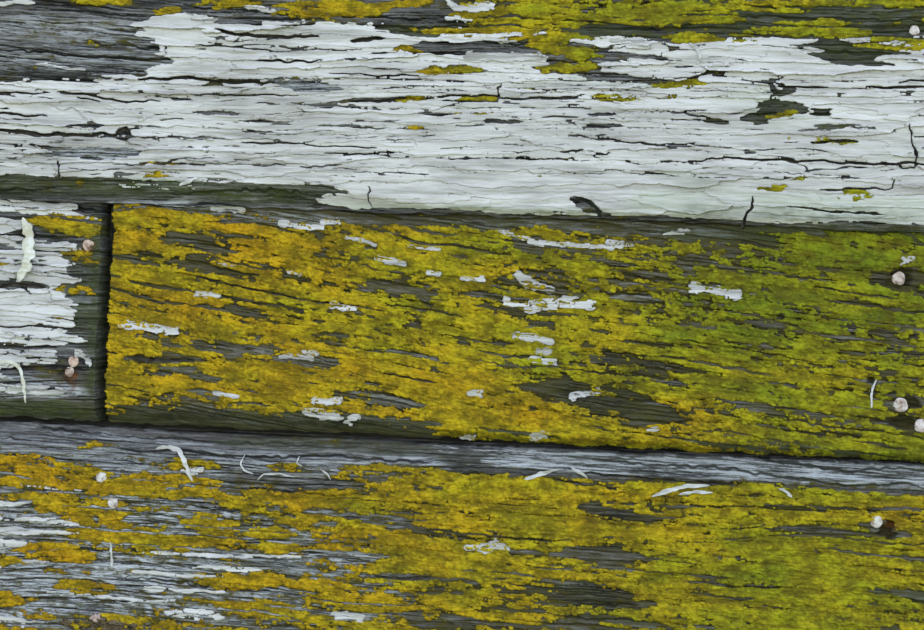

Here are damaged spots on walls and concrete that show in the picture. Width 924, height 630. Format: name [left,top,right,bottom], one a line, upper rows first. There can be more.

peeling [0,0,924,235]
crack [560,128,923,213]
crack [741,197,754,228]
peeling [0,199,98,396]
peeling [502,270,596,314]
peeling [688,281,742,301]
peeling [118,320,180,335]
peeling [511,331,558,366]
peeling [301,396,361,426]
peeling [0,500,79,548]
peeling [47,550,310,621]
peeling [331,611,365,623]